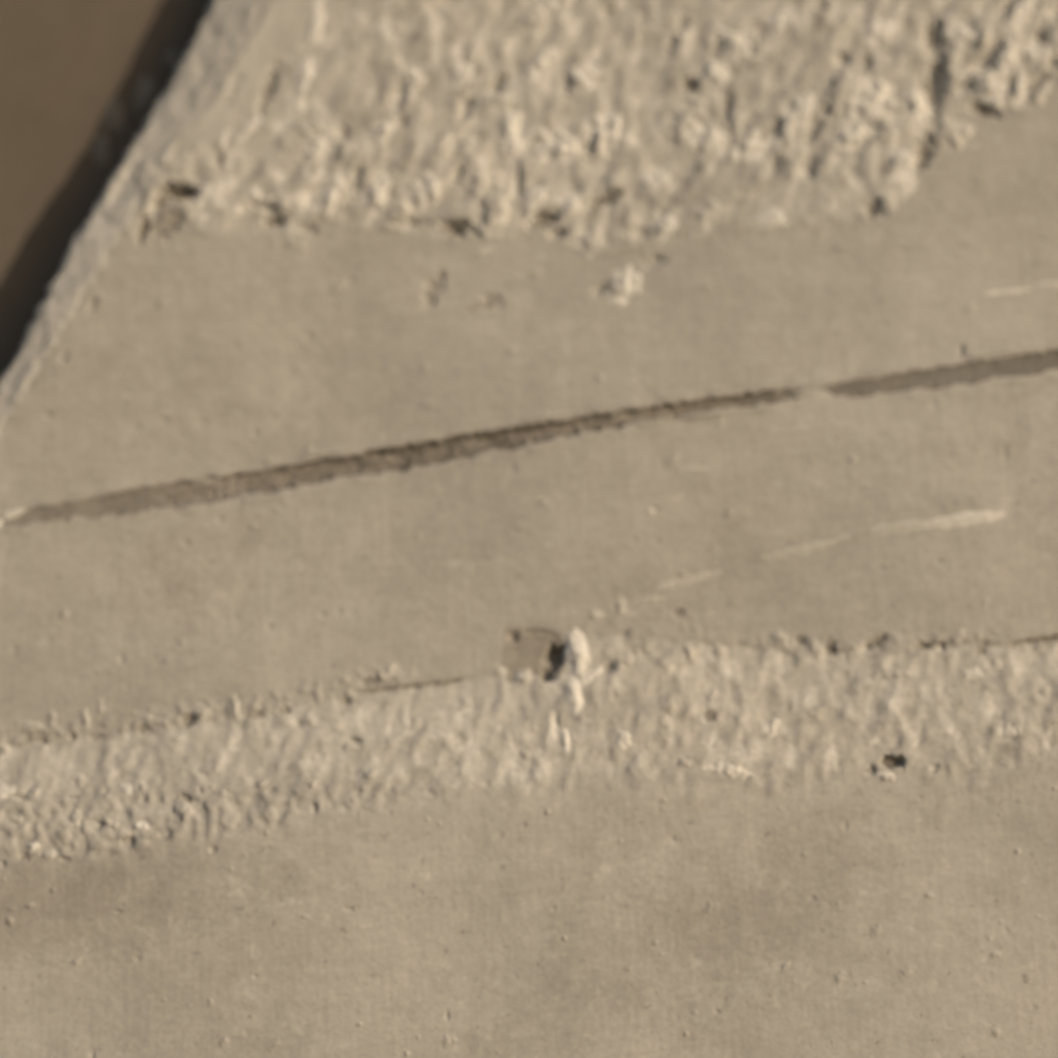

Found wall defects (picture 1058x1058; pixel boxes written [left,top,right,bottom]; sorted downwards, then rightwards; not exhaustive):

spalling [126,0,1058,307]
crack [0,347,1058,528]
crack [795,636,837,657]
crack [865,635,888,649]
crack [913,642,941,650]
crack [975,635,1058,656]
spalling [494,646,562,688]
crack [359,677,466,694]
spalling [677,756,755,780]
spalling [866,757,902,783]
spalling [0,782,41,800]
spalling [172,795,195,823]